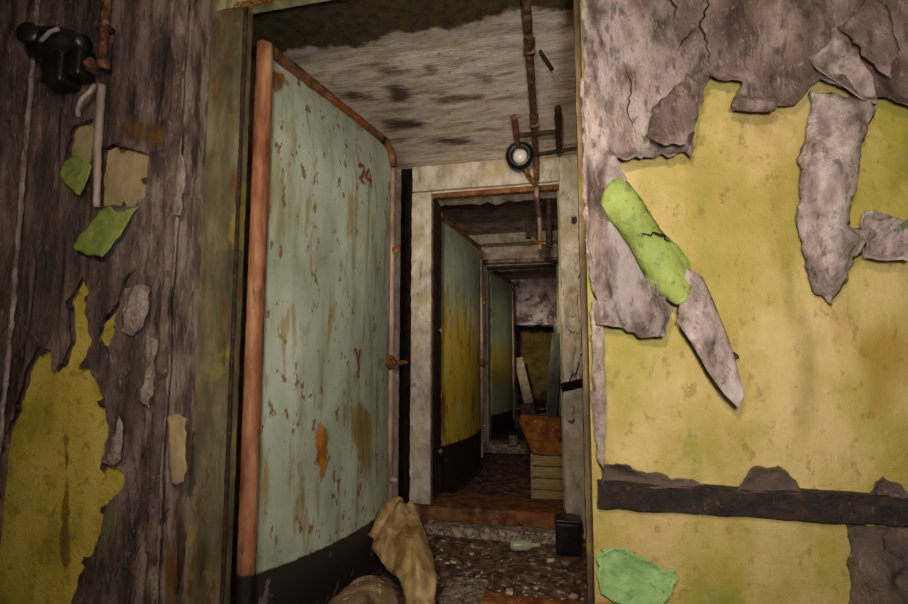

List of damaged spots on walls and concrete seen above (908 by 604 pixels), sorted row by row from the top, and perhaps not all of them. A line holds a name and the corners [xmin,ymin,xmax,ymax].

crack [670,0,710,63]
rust [273,71,288,90]
leakage [386,85,409,101]
leakage [439,95,478,103]
crack [624,63,634,128]
peeling [66,120,94,163]
leakage [383,119,422,140]
peeling [101,147,149,207]
peeling [560,0,908,489]
peeling [0,283,159,604]
peeling [166,413,187,486]
rust [316,423,329,478]